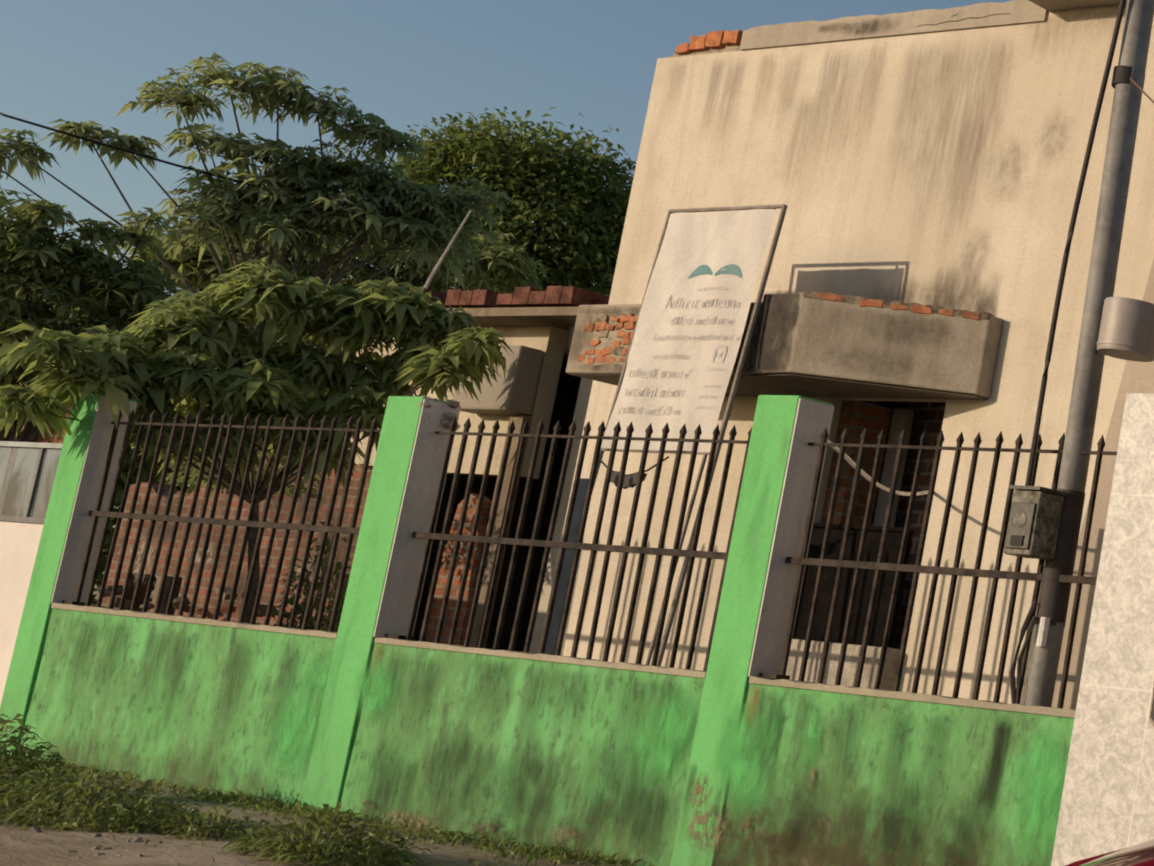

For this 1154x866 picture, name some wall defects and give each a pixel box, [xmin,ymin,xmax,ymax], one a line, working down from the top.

flaking render [675,30,743,55]
flaking render [804,289,994,320]
spalling [578,313,638,366]
leakage [1021,741,1062,859]